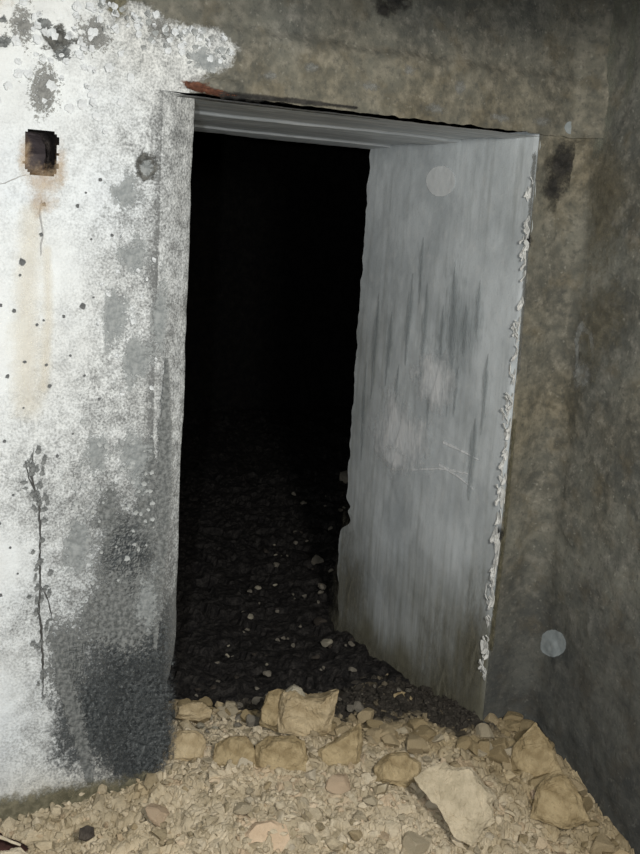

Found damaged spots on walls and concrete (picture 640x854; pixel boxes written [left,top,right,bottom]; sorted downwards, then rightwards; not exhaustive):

water stain [0,0,124,134]
rust [183,81,358,109]
spalling [478,153,536,681]
crack [20,445,54,699]
water stain [0,358,176,822]